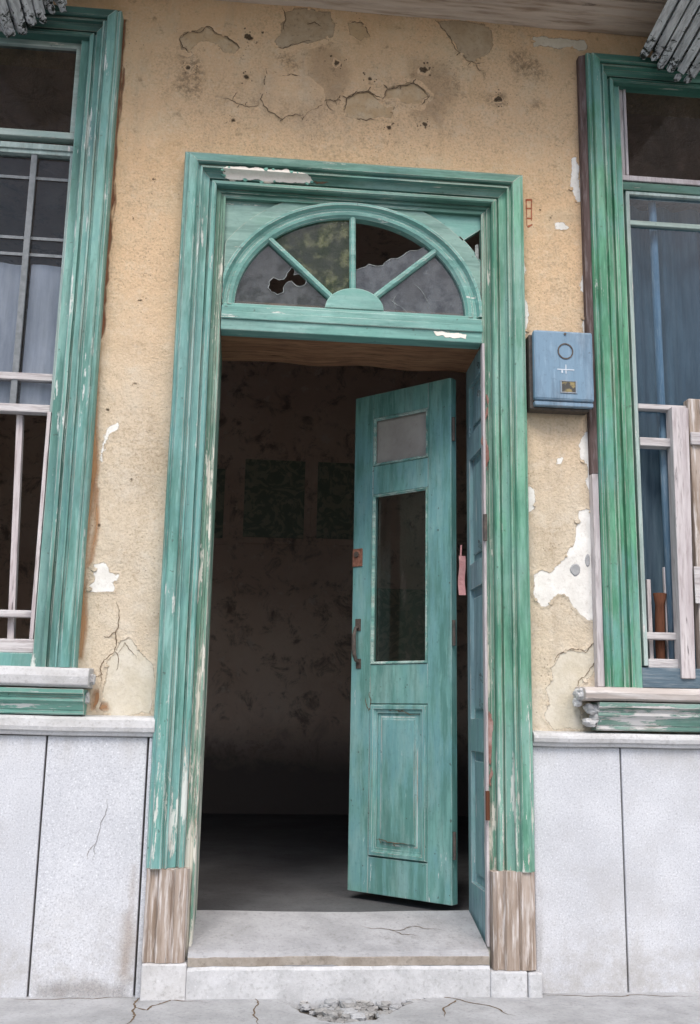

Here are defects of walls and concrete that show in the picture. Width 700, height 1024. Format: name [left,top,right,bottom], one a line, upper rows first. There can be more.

flaking render [173,6,347,73]
flaking render [338,62,435,135]
peeling [221,166,329,185]
peeling [568,155,580,205]
peeling [98,421,120,463]
peeling [530,428,593,624]
peeling [86,560,122,595]
crack [96,605,120,681]
crack [28,997,201,1024]